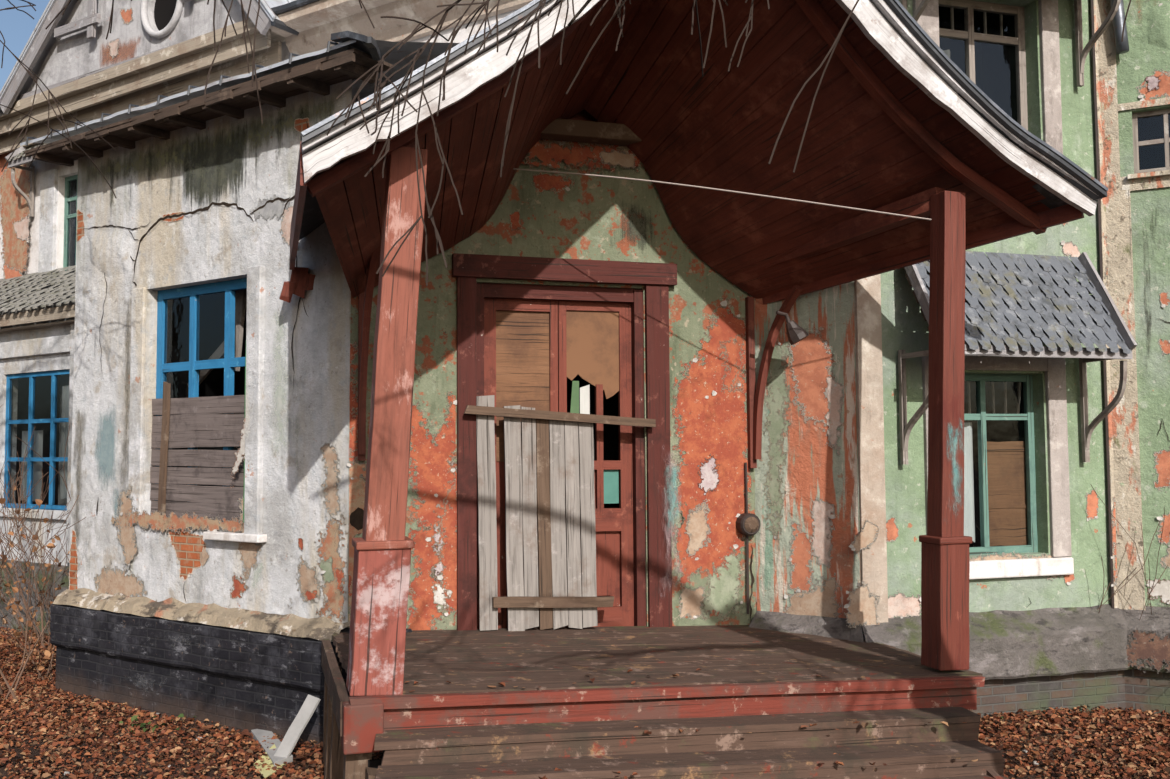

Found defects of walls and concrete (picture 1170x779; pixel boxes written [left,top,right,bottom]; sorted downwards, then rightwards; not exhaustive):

peeling [0,151,31,291]
peeling [93,484,157,601]
crack [84,195,295,380]
flaking render [167,529,217,581]
damp [170,128,257,205]
peeling [230,419,263,599]
crack [291,297,308,390]
peeling [296,342,367,628]
peeling [406,392,457,630]
peeling [666,297,752,620]
peeling [778,326,845,455]
spalling [782,498,921,628]